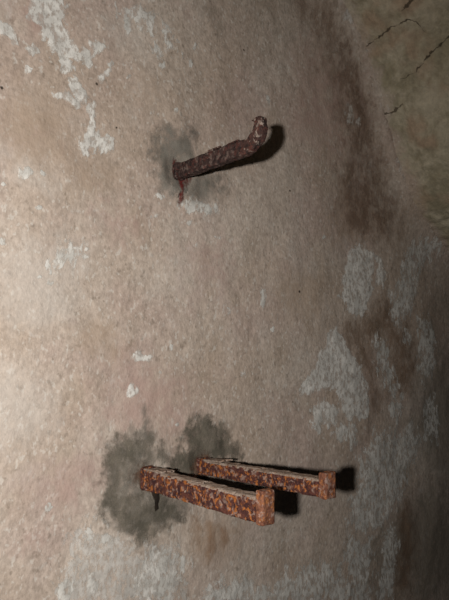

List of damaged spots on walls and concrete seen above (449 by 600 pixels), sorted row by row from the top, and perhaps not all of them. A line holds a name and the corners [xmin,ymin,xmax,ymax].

peeling [0,20,18,45]
peeling [26,0,114,157]
peeling [114,2,180,68]
crack [366,0,421,47]
crack [401,36,449,79]
leakage [170,415,244,477]
leakage [102,424,186,542]